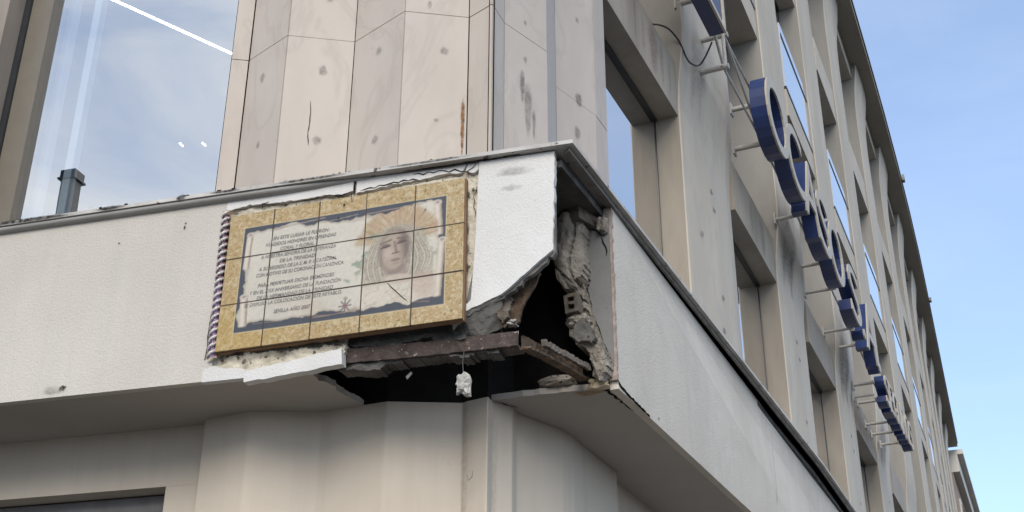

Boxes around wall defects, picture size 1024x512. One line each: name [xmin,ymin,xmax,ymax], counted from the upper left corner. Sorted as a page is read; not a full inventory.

spalling [202,151,619,391]